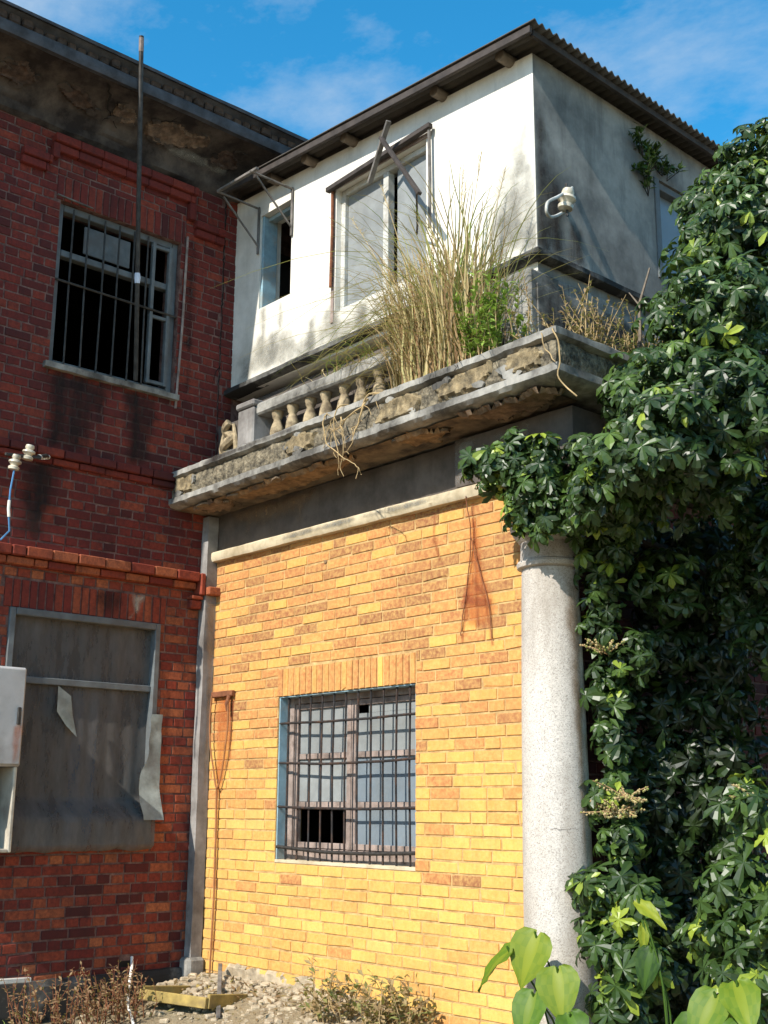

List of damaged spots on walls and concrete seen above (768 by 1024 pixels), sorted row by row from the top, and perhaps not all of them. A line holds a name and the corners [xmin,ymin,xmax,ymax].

spalling [143,118,211,149]
spalling [373,393,422,427]
spalling [282,431,318,458]
spalling [391,427,453,447]
spalling [174,473,196,497]
spalling [193,454,357,513]